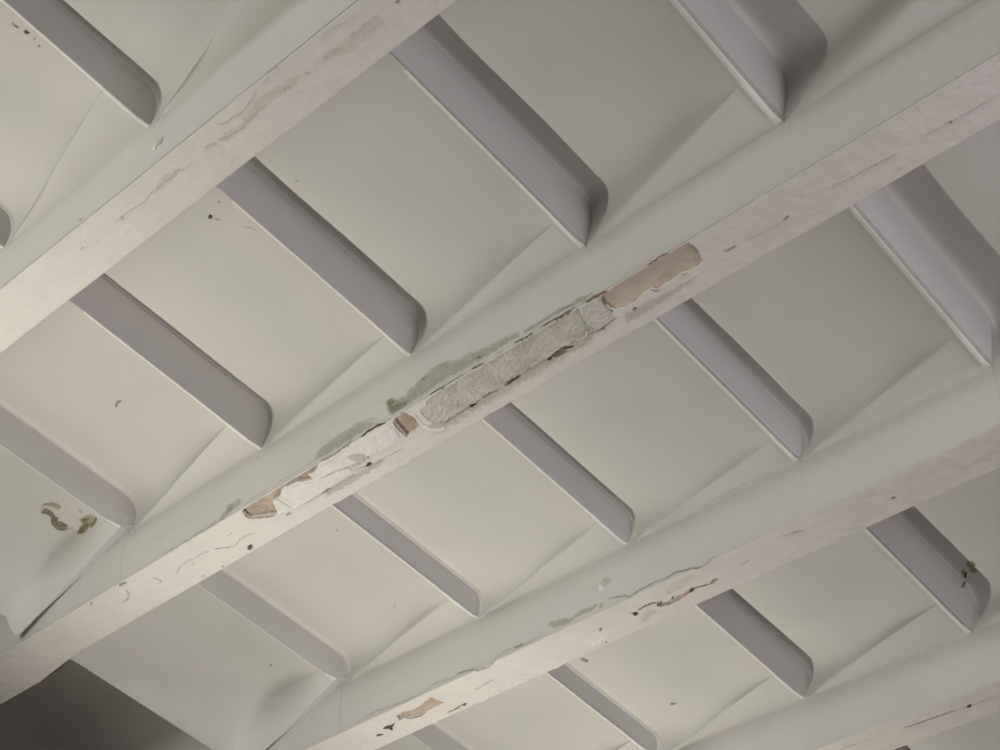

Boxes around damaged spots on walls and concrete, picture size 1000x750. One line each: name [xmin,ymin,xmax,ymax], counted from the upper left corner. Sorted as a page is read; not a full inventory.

peeling [243,242,702,519]
spalling [376,697,442,737]
crack [352,556,718,725]